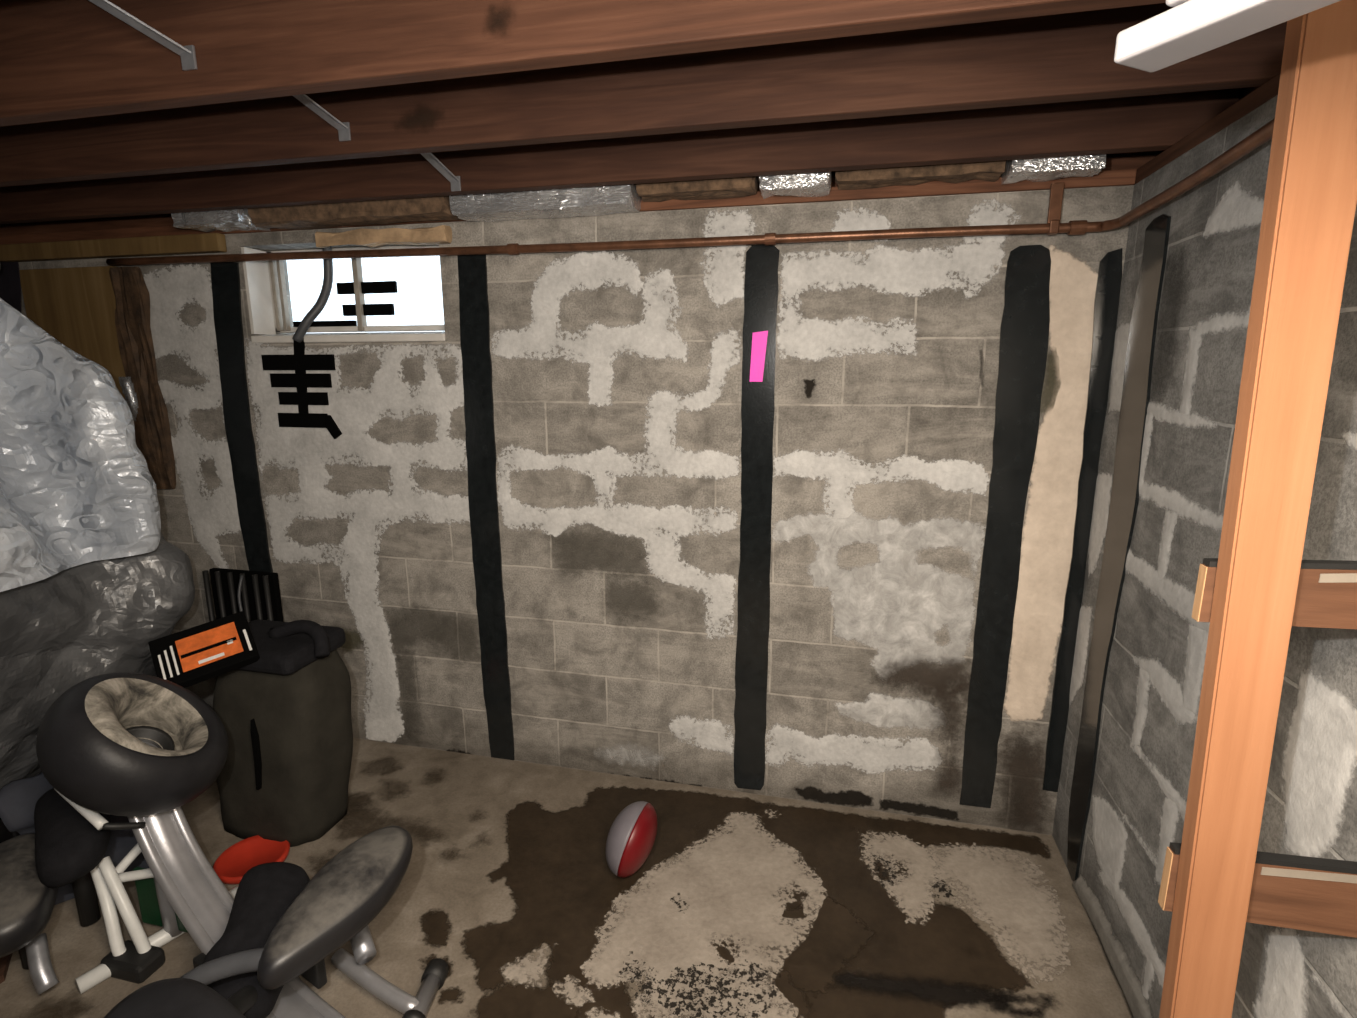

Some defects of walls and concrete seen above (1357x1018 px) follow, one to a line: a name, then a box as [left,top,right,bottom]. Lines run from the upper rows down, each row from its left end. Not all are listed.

water stain [1040,353,1060,412]
water stain [339,630,363,652]
water stain [879,660,969,792]